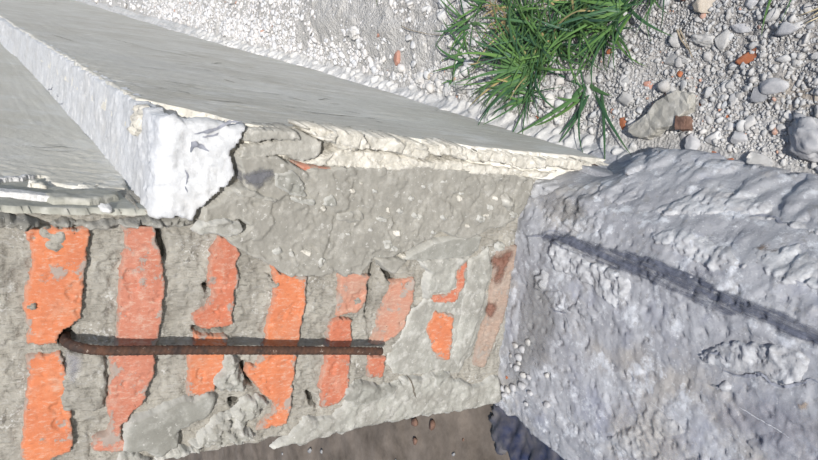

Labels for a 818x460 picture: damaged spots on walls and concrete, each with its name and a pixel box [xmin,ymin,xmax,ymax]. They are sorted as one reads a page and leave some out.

peeling [190,218,243,237]
leakage [542,234,818,344]